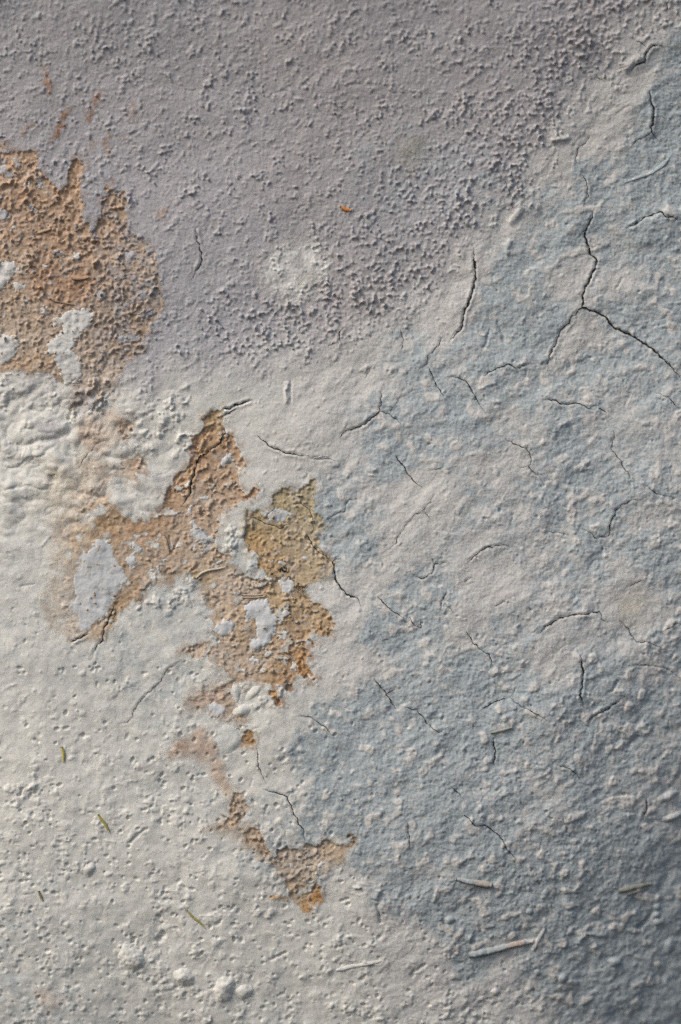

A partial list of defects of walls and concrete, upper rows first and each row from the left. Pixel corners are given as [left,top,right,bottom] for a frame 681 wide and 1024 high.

crack [597,41,664,81]
crack [631,90,658,147]
peeling [0,146,164,413]
crack [257,135,681,460]
peeling [42,410,336,747]
crack [248,498,516,628]
crack [382,455,444,553]
crack [545,398,668,539]
crack [579,654,628,721]
crack [540,611,681,675]
crack [257,752,304,837]
peeling [224,793,357,912]